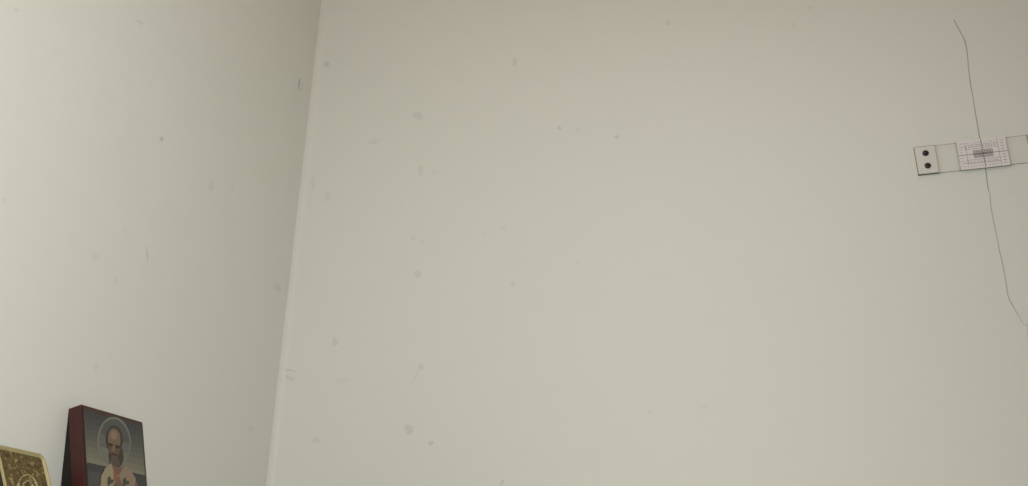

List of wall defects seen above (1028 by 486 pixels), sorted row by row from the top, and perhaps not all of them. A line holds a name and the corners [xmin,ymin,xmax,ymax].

crack [954,20,980,139]
crack [985,168,1028,337]